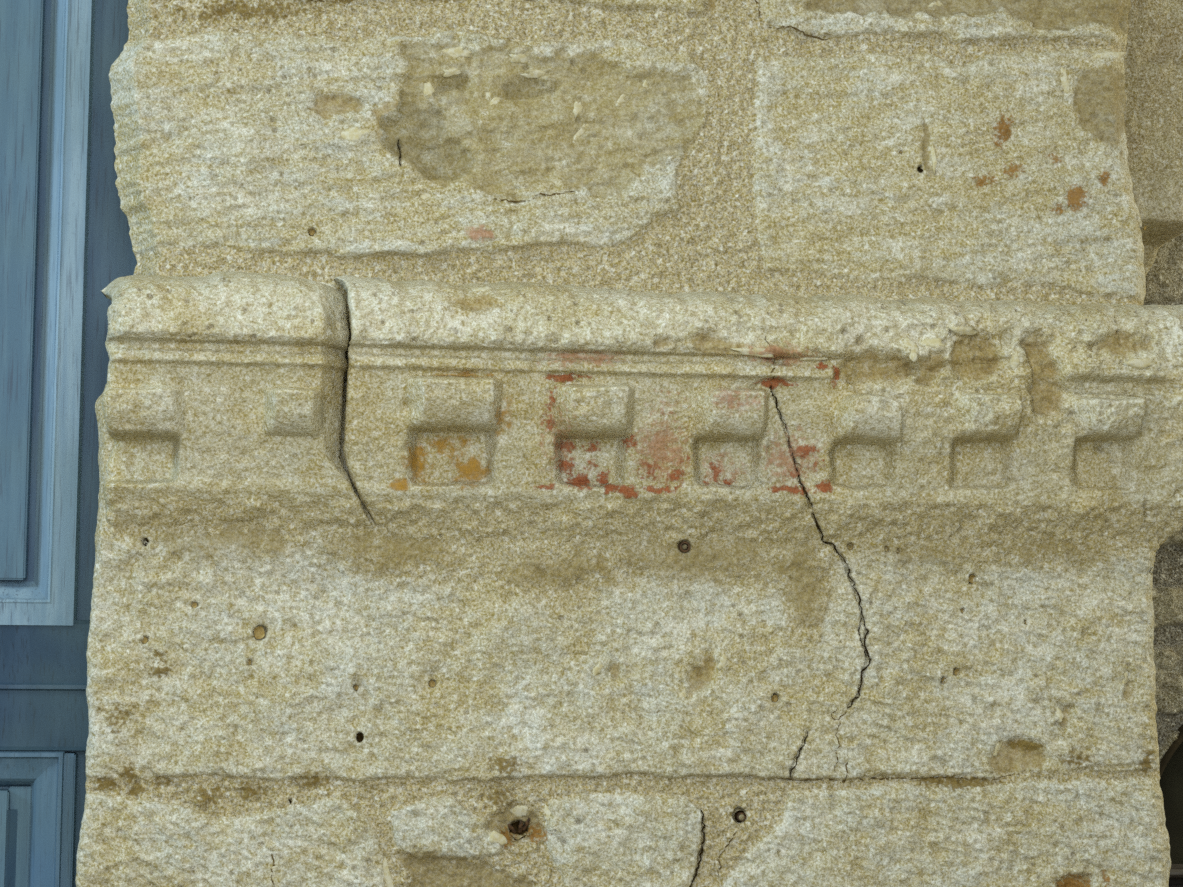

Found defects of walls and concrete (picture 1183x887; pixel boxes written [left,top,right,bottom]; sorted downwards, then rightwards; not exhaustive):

crack [765,336,1020,783]
crack [690,810,737,887]